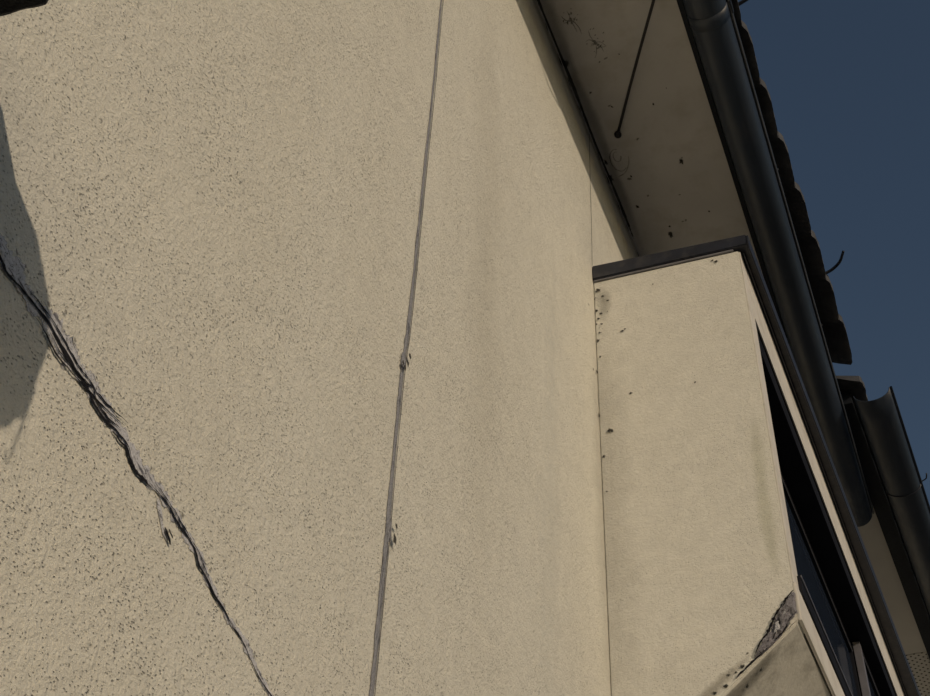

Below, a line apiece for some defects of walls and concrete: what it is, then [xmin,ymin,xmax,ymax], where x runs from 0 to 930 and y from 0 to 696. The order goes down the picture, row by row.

crack [0,234,274,696]
spalling [737,590,799,677]